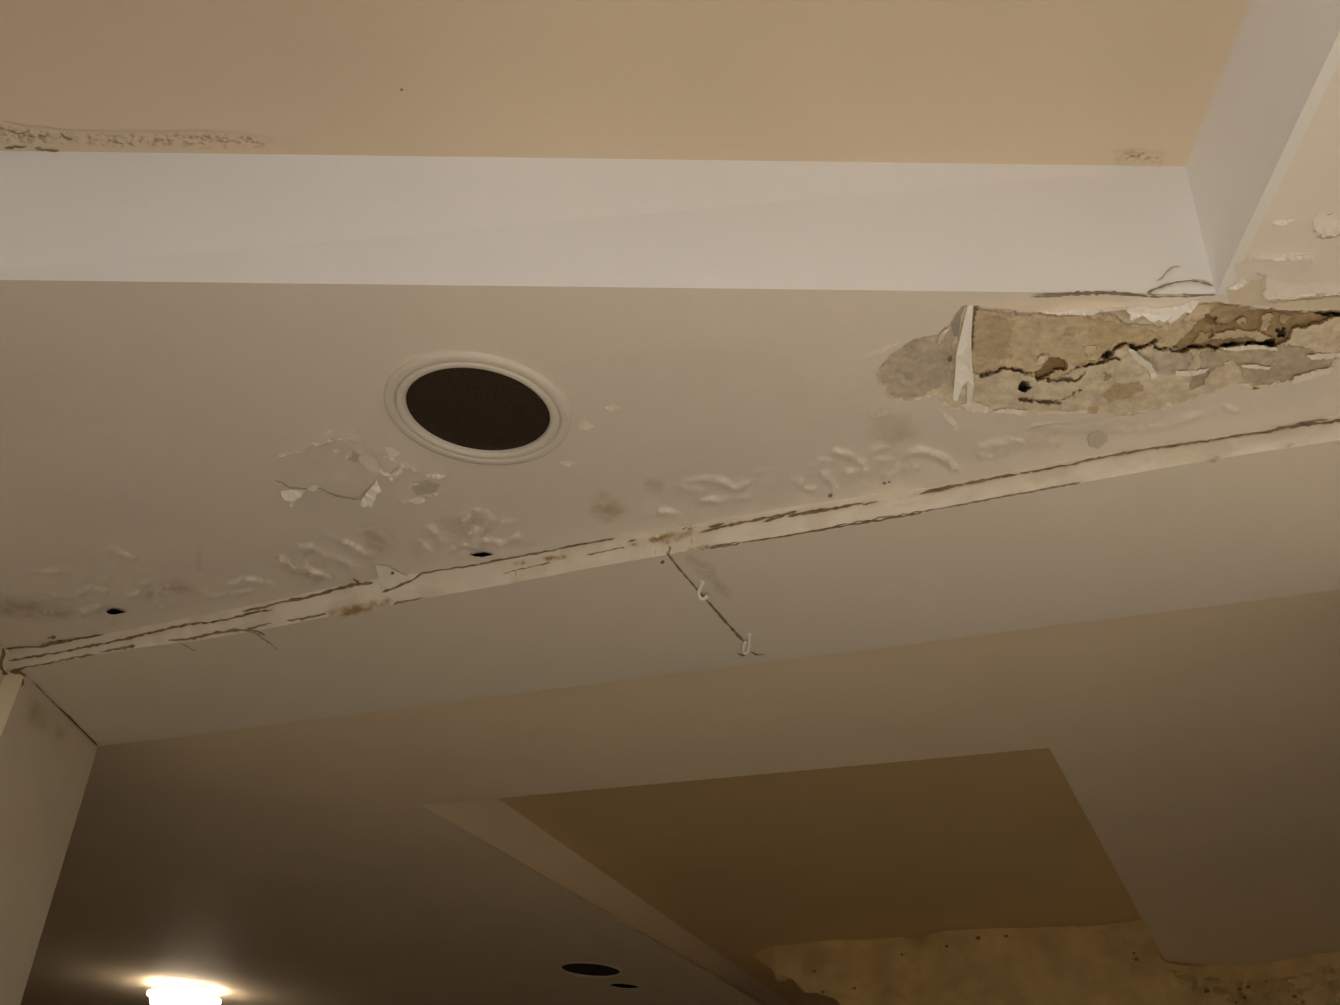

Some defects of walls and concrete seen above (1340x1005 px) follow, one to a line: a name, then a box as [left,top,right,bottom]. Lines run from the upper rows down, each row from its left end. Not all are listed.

damp [0,121,275,151]
spalling [876,211,1340,416]
crack [1033,266,1216,298]
crack [0,419,1340,746]